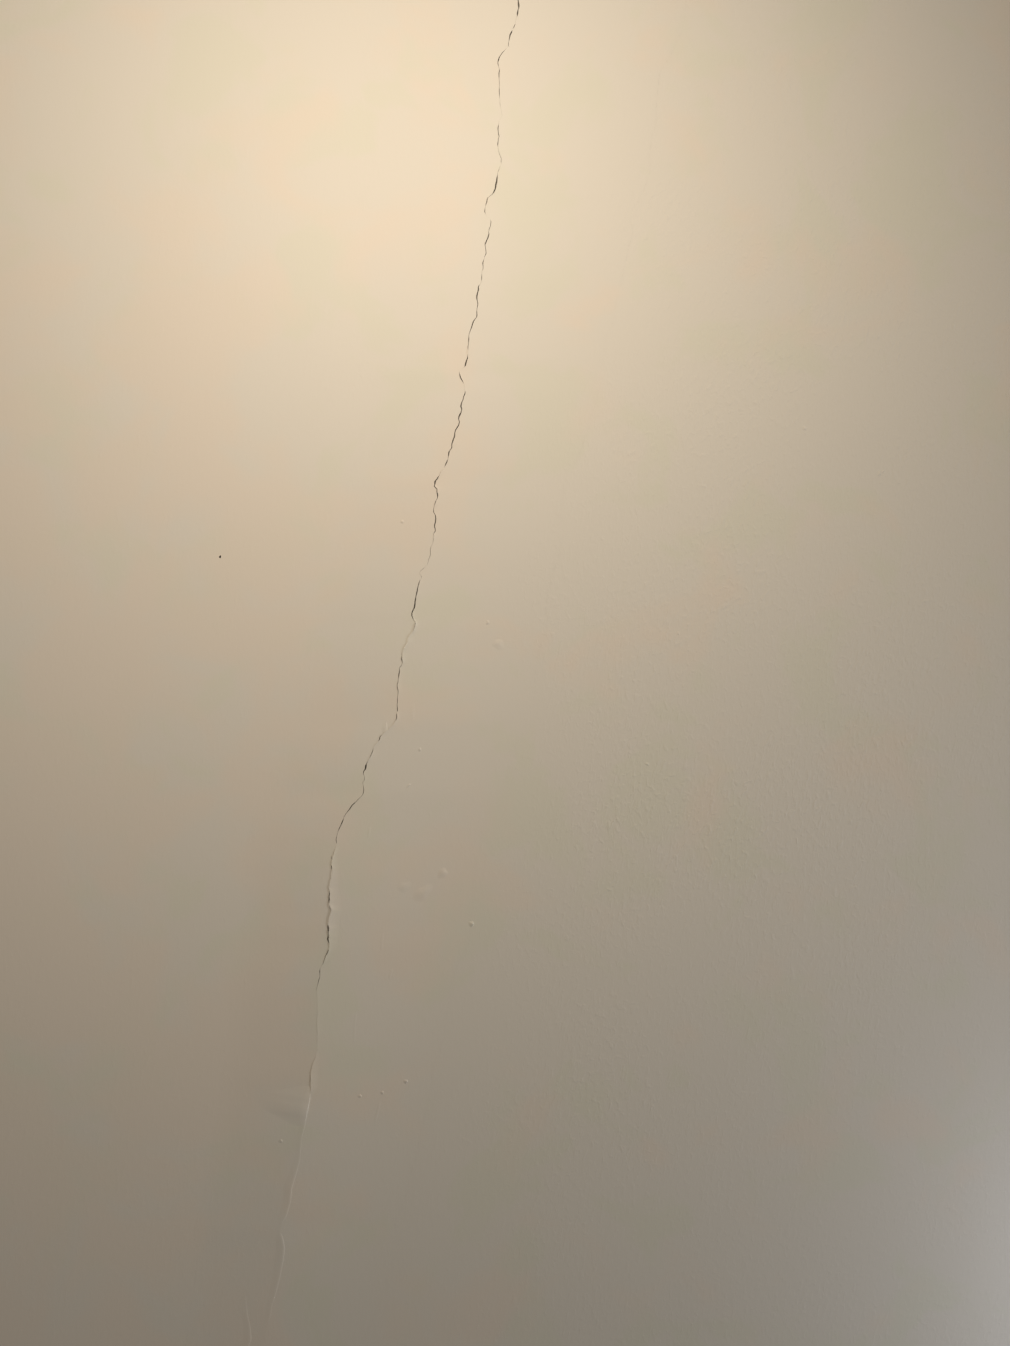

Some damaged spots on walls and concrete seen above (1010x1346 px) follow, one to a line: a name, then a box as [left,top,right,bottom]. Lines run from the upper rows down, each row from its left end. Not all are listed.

crack [316,0,519,990]